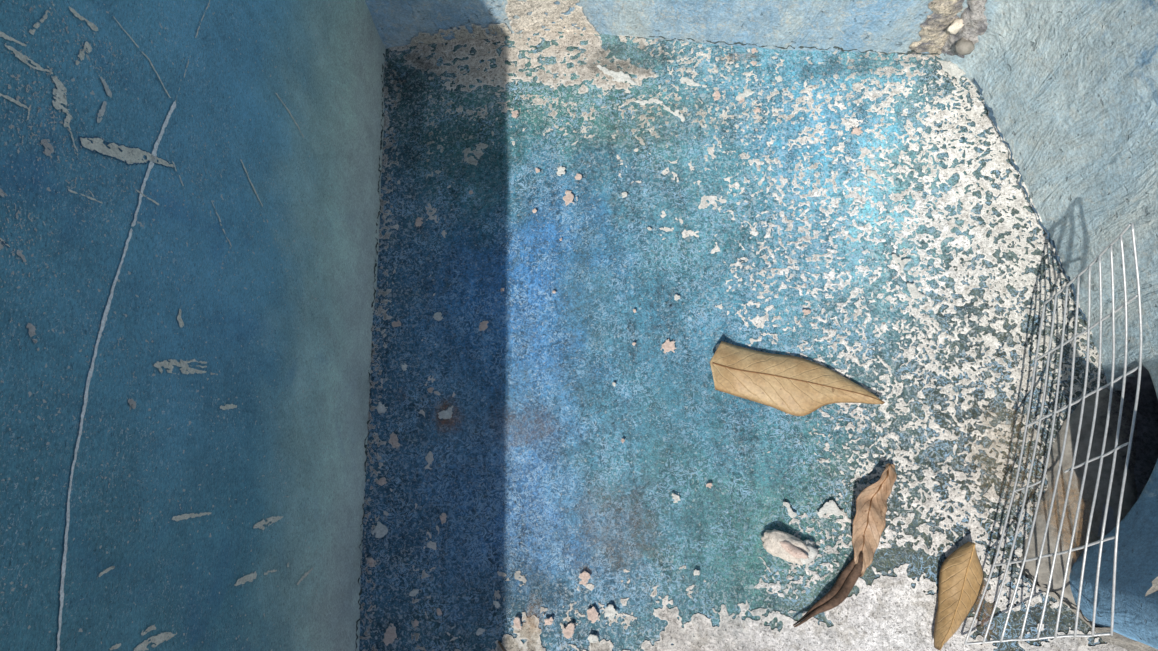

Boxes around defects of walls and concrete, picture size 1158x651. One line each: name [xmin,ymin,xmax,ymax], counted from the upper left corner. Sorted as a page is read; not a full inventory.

peeling [0,1,304,545]
peeling [359,0,1128,651]
peeling [110,625,177,651]